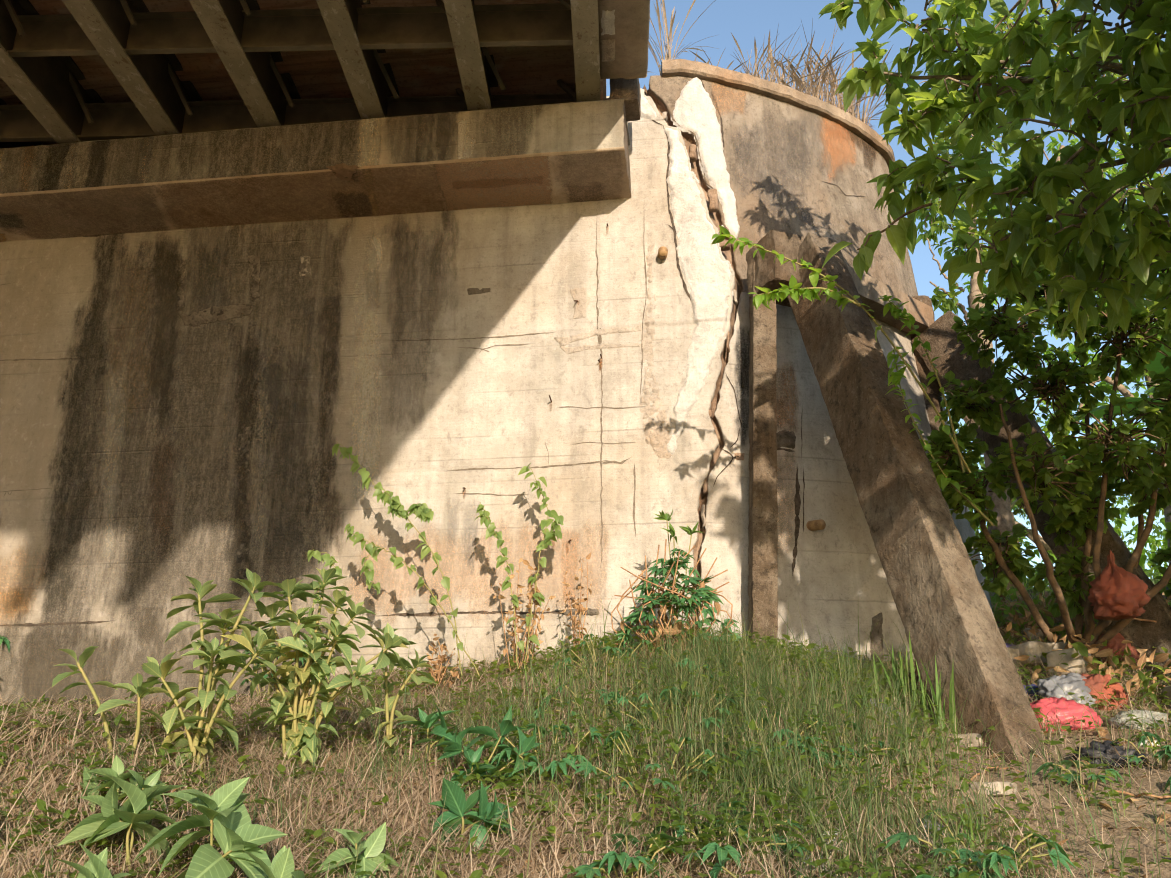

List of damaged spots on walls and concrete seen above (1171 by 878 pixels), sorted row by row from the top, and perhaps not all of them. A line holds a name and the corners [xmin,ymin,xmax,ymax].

leakage [0,106,542,712]
crack [449,442,636,535]
flaking render [554,77,740,459]
crack [559,78,743,628]